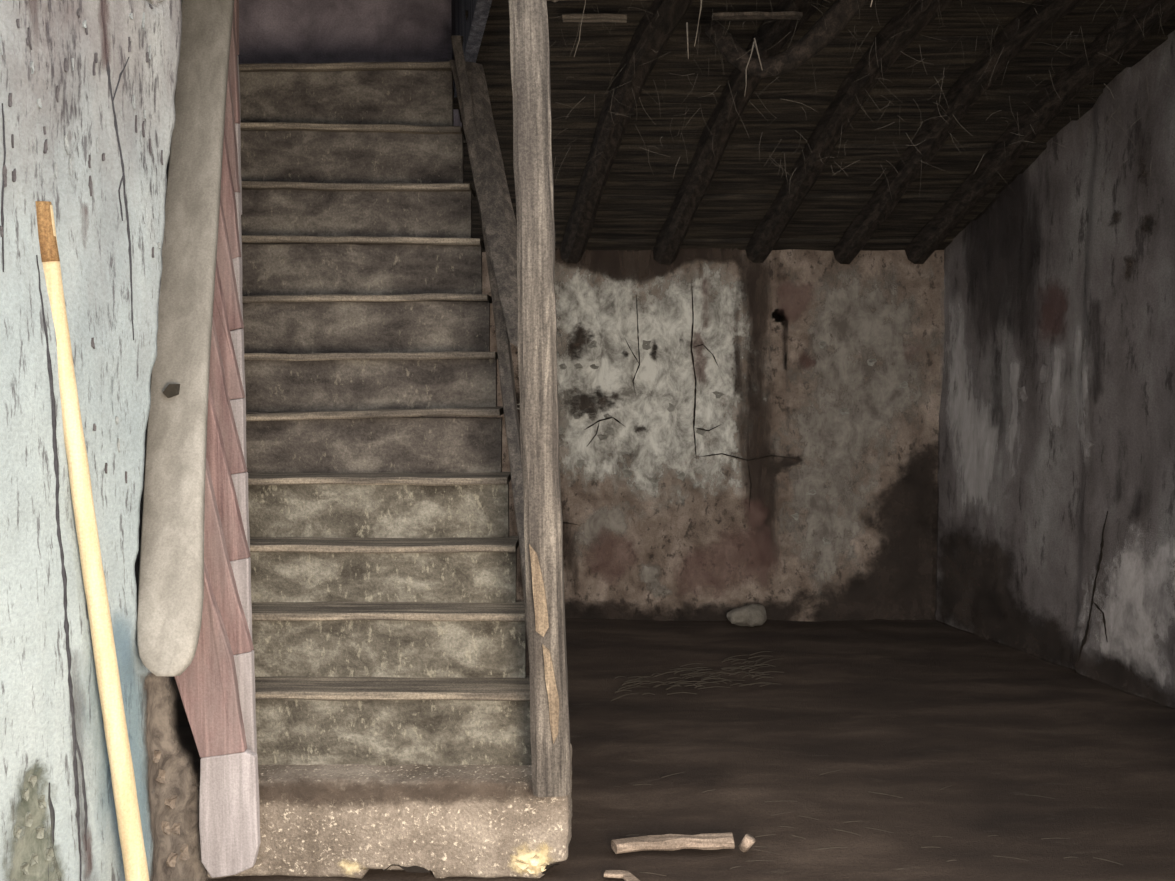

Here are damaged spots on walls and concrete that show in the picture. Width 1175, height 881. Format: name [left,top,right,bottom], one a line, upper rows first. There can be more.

crack [101,0,134,340]
crack [586,417,624,446]
crack [625,292,640,395]
leakage [555,248,803,564]
crack [691,290,799,510]
leakage [762,169,1175,707]
leakage [510,512,524,601]
leakage [562,509,577,586]
leakage [564,600,732,621]
crack [1075,511,1108,673]